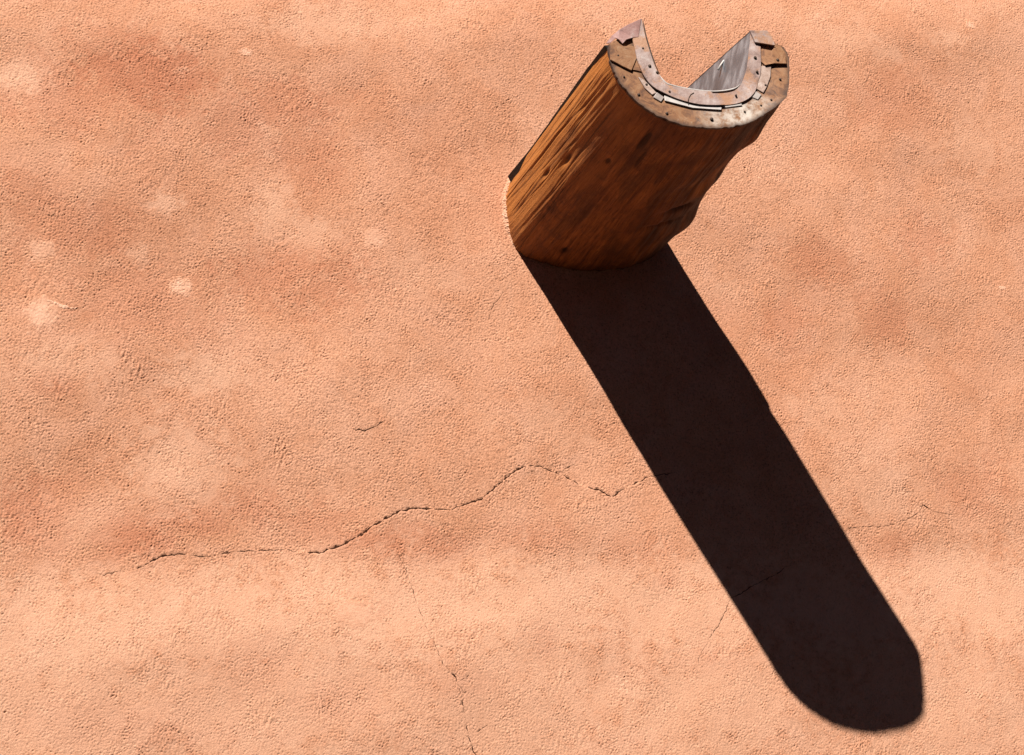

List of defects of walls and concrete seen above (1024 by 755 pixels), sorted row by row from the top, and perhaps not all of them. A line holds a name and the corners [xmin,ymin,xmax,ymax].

crack [105,464,675,575]